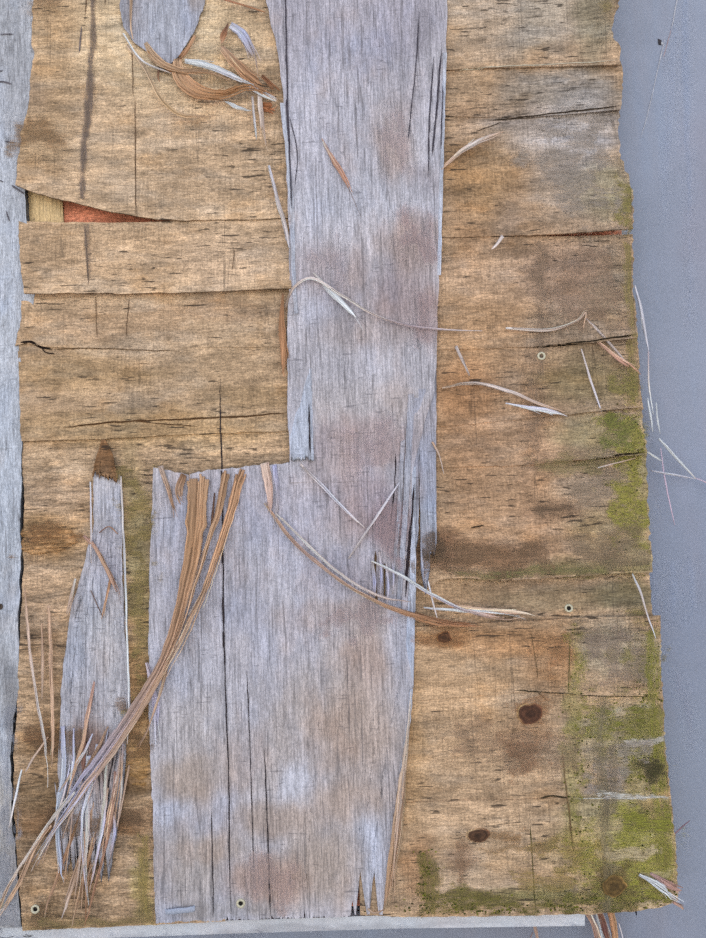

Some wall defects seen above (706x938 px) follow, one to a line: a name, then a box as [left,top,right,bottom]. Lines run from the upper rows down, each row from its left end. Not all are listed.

crack [408,21,620,173]
crack [65,380,282,476]
crack [515,634,648,701]
crack [211,509,271,918]
leakage [624,737,664,746]
crack [542,752,667,852]
leakage [597,790,663,799]
crack [529,827,537,910]
leakage [604,846,662,861]